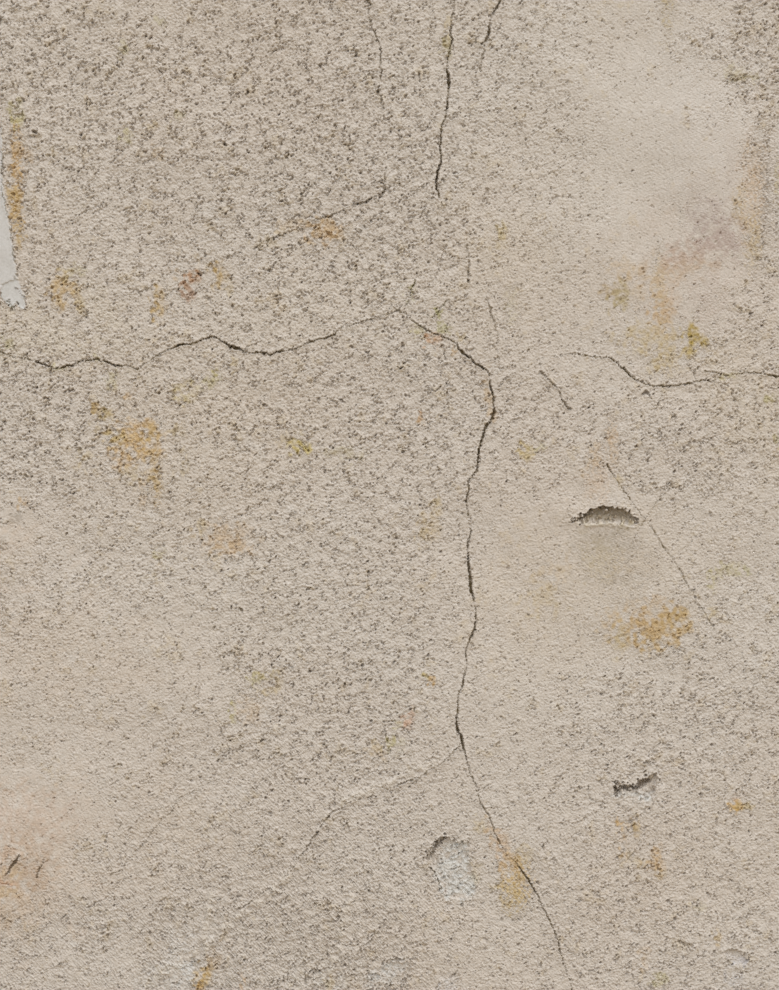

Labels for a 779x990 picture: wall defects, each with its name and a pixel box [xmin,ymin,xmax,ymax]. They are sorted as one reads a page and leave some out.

crack [366,0,385,113]
crack [435,0,502,199]
crack [0,126,27,311]
crack [254,166,387,250]
crack [0,244,779,990]
spalling [610,760,661,806]
spalling [422,833,478,901]